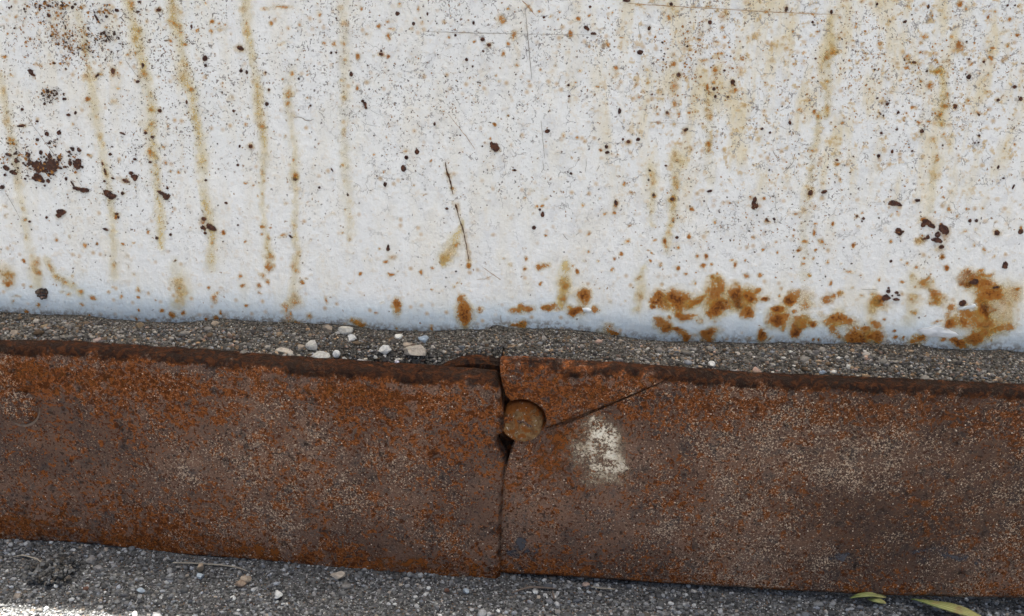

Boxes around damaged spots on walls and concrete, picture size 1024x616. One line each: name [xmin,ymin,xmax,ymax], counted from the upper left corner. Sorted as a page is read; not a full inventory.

rust [456,282,482,326]
rust [509,261,598,329]
rust [640,254,926,344]
rust [900,254,1020,350]
crack [546,368,673,431]